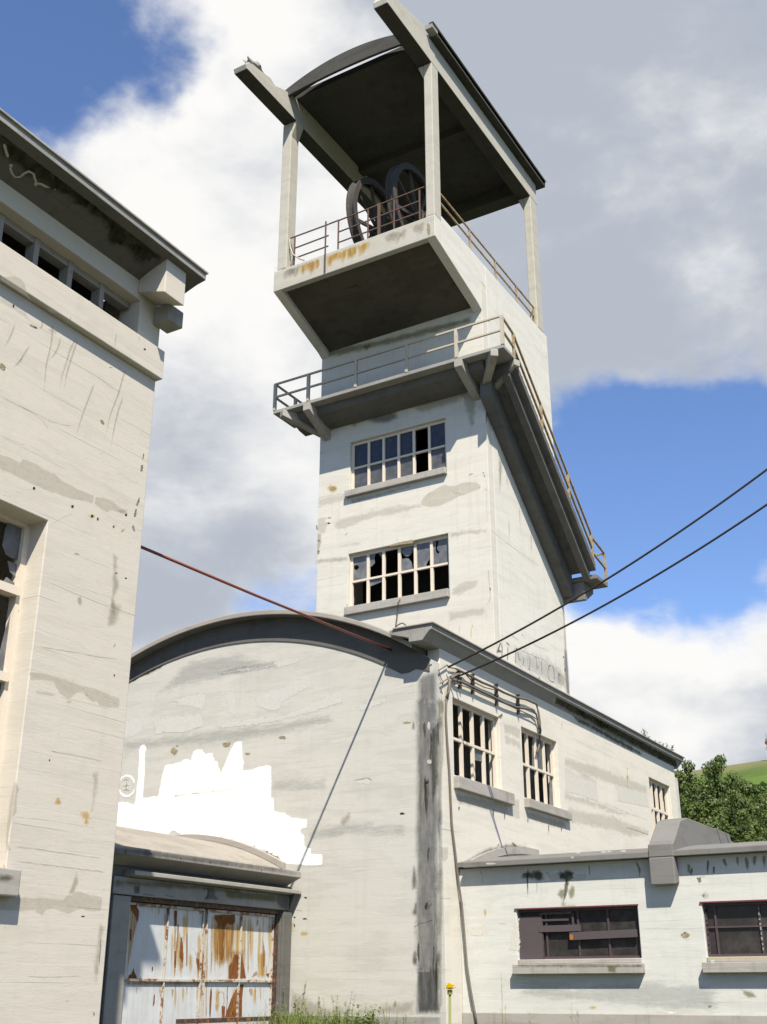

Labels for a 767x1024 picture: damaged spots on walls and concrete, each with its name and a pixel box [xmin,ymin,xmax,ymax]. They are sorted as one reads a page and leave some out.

water stain [525,871,586,881]
corrosion [174,910,204,979]
corrosion [209,914,246,1017]